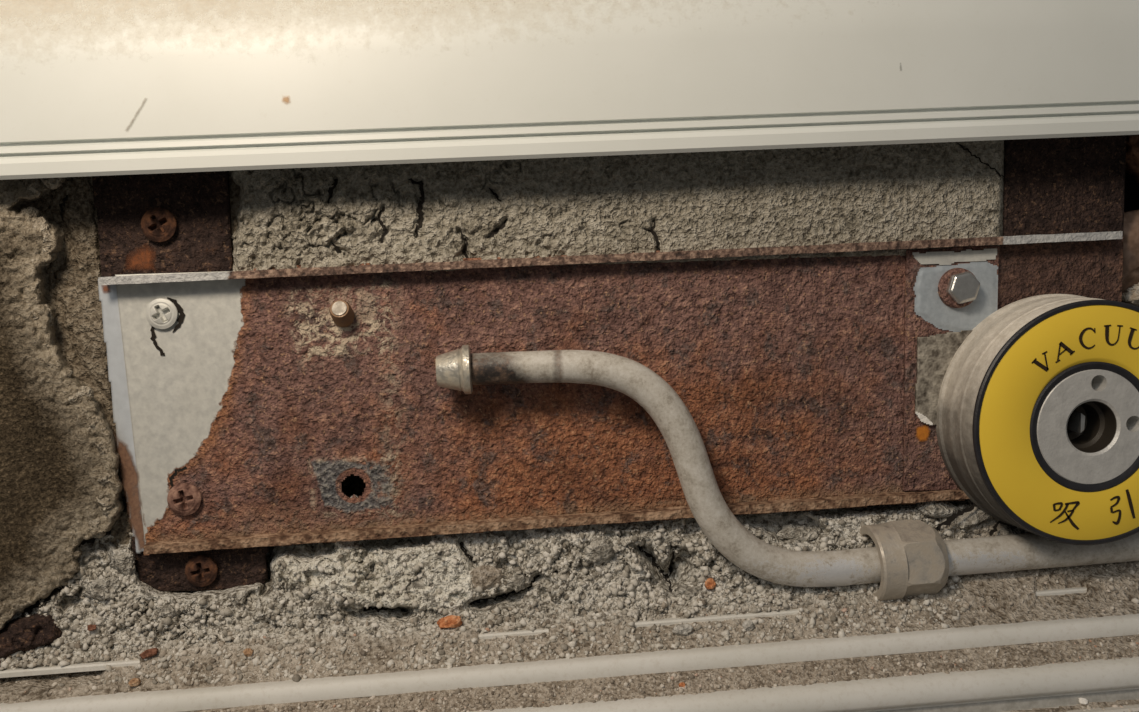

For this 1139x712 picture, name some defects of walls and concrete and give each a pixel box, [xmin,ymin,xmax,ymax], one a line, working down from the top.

crack [327,179,338,203]
crack [371,206,388,243]
crack [408,178,424,238]
crack [460,188,507,258]
crack [644,220,660,250]
corrosion [998,236,1124,310]
corrosion [117,249,916,555]
corrosion [917,426,929,441]
crack [460,542,476,564]
crack [639,546,675,593]
crack [469,575,540,605]